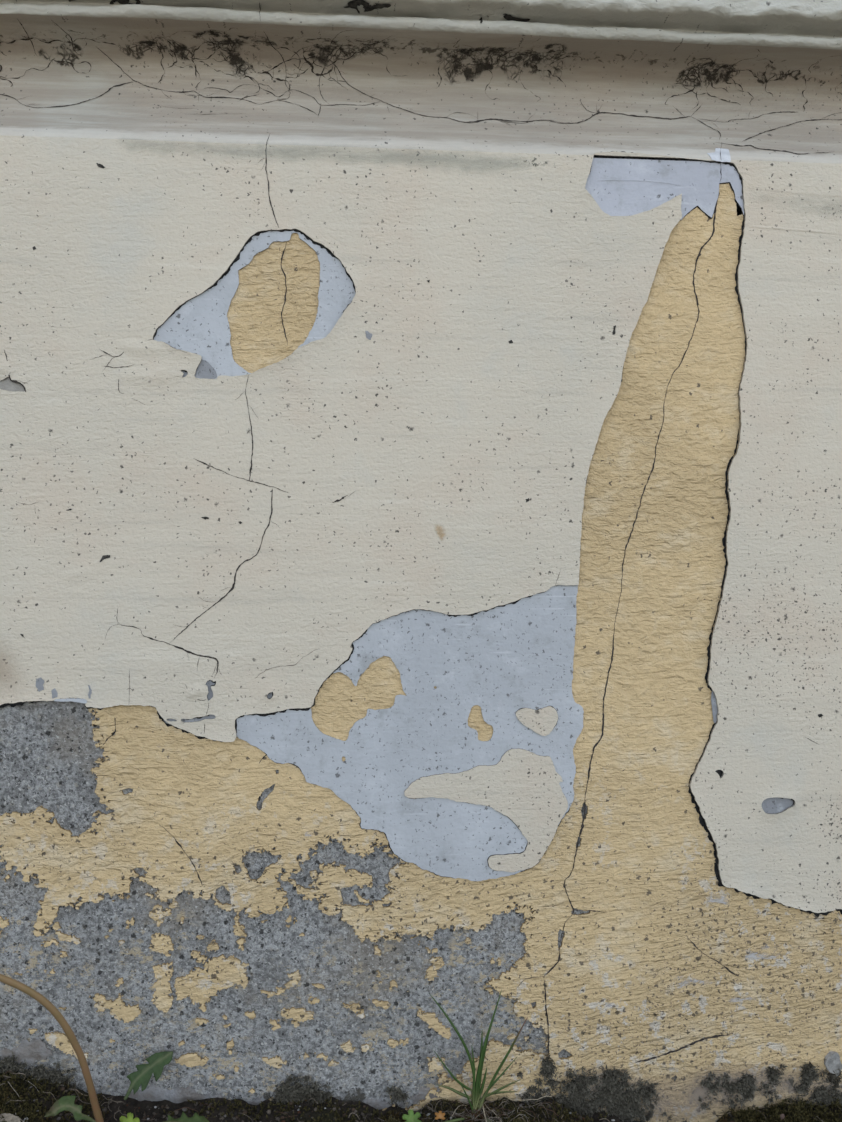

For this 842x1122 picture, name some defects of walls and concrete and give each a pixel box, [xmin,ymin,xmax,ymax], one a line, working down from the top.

water stain [0,28,406,101]
crack [0,23,842,181]
water stain [438,40,582,100]
water stain [665,49,842,112]
peeling [153,229,356,379]
crack [258,135,288,343]
crack [105,375,288,733]
peeling [206,680,216,700]
peeling [235,158,746,885]
crack [520,199,718,1056]
peeling [0,698,842,1122]
water stain [683,1076,790,1108]